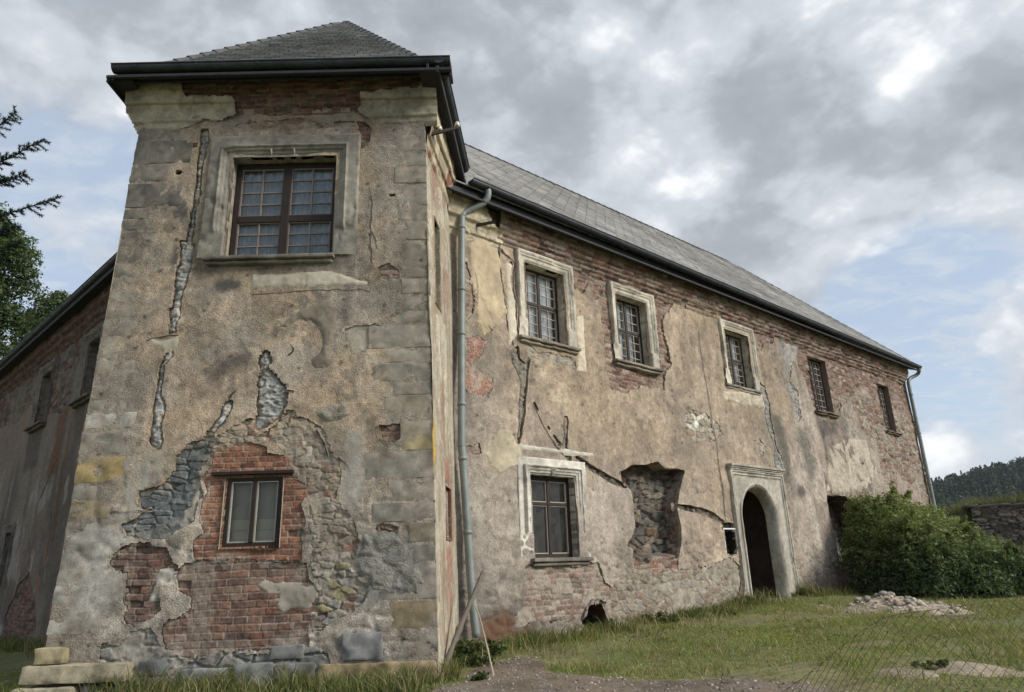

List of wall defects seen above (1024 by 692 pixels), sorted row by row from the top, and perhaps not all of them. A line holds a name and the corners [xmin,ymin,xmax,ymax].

spalling [256,351,294,430]
peeling [465,238,516,396]
crack [497,244,626,488]
crack [760,385,785,478]
flaking render [110,430,327,659]
flaking render [515,562,626,628]